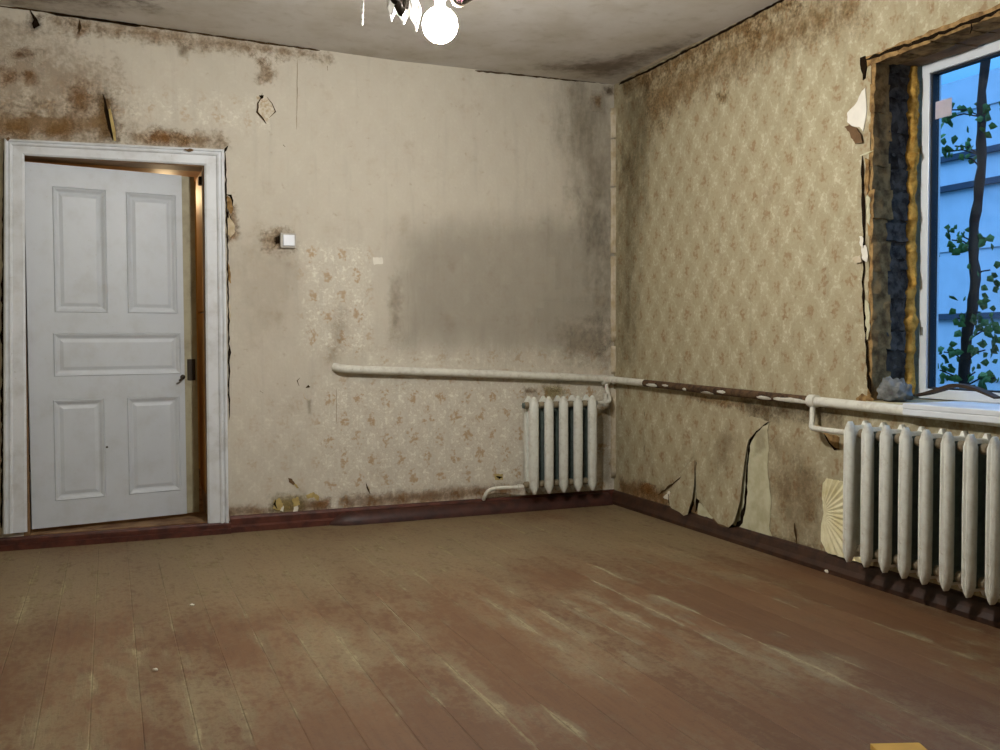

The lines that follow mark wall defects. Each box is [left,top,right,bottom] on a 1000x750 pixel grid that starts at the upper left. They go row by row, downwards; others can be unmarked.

leakage [645,3,853,119]
leakage [0,88,111,141]
leakage [136,131,222,146]
flaking render [845,3,1000,405]
peeling [273,478,319,512]
leakage [342,489,506,507]
peeling [658,416,772,536]